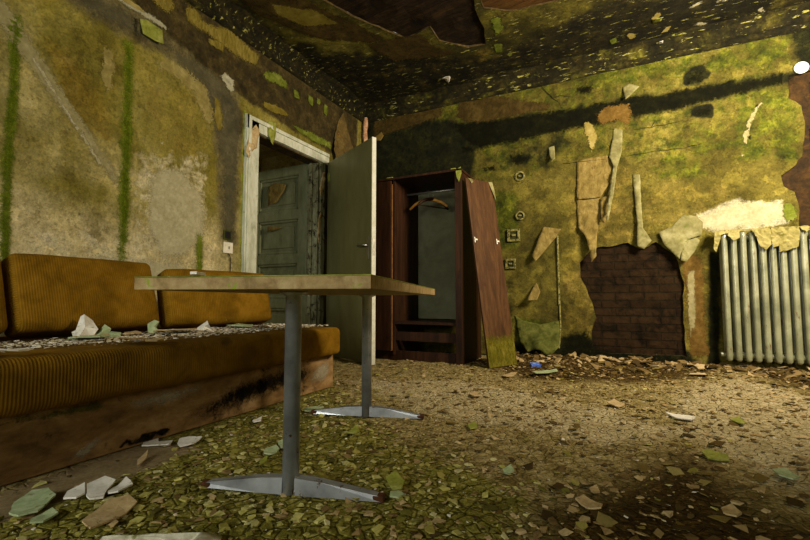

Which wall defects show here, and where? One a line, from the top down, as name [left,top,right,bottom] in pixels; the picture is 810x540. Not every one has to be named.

spalling [242,0,559,57]
peeling [651,13,671,44]
damp [2,22,19,259]
damp [121,45,131,242]
damp [155,41,241,238]
spalling [584,103,632,152]
flaking render [781,70,810,229]
flaking render [580,242,710,358]